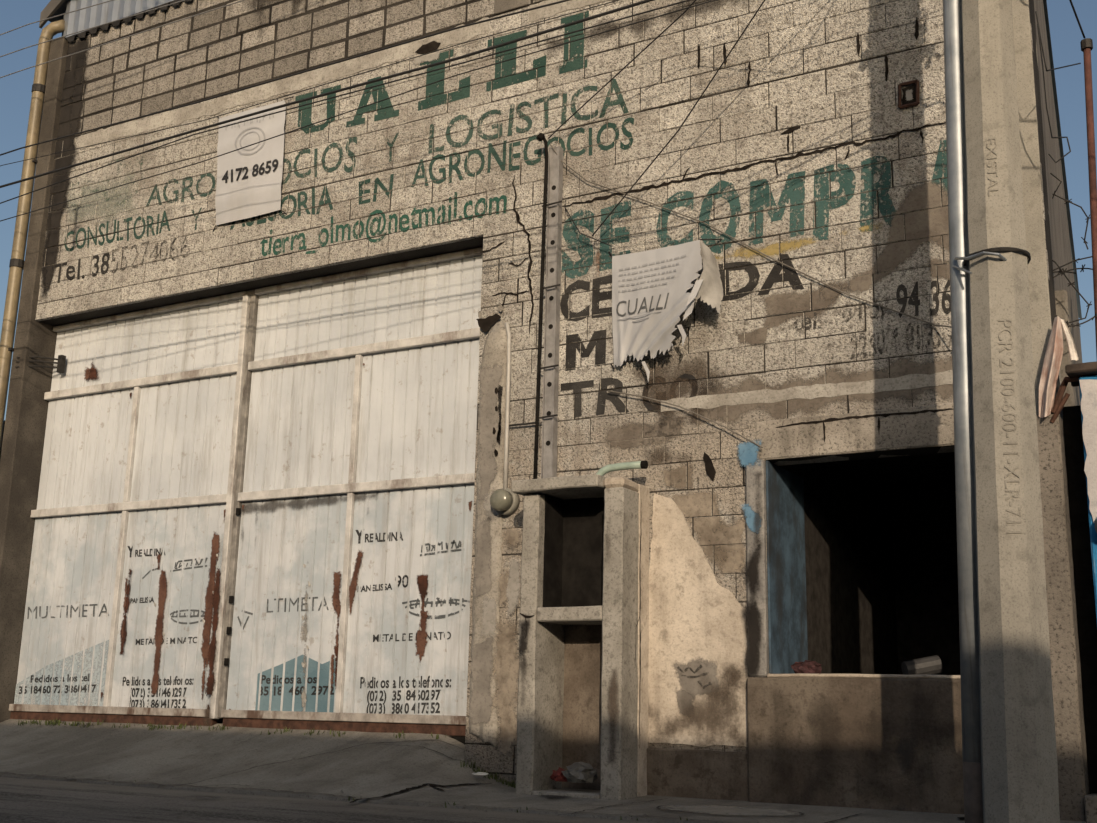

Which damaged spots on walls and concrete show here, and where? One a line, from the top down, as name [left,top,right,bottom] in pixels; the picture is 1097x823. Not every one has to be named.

crack [480,175,534,334]
corrosion [151,554,167,695]
corrosion [201,532,220,709]
corrosion [330,551,363,693]
corrosion [415,574,429,661]